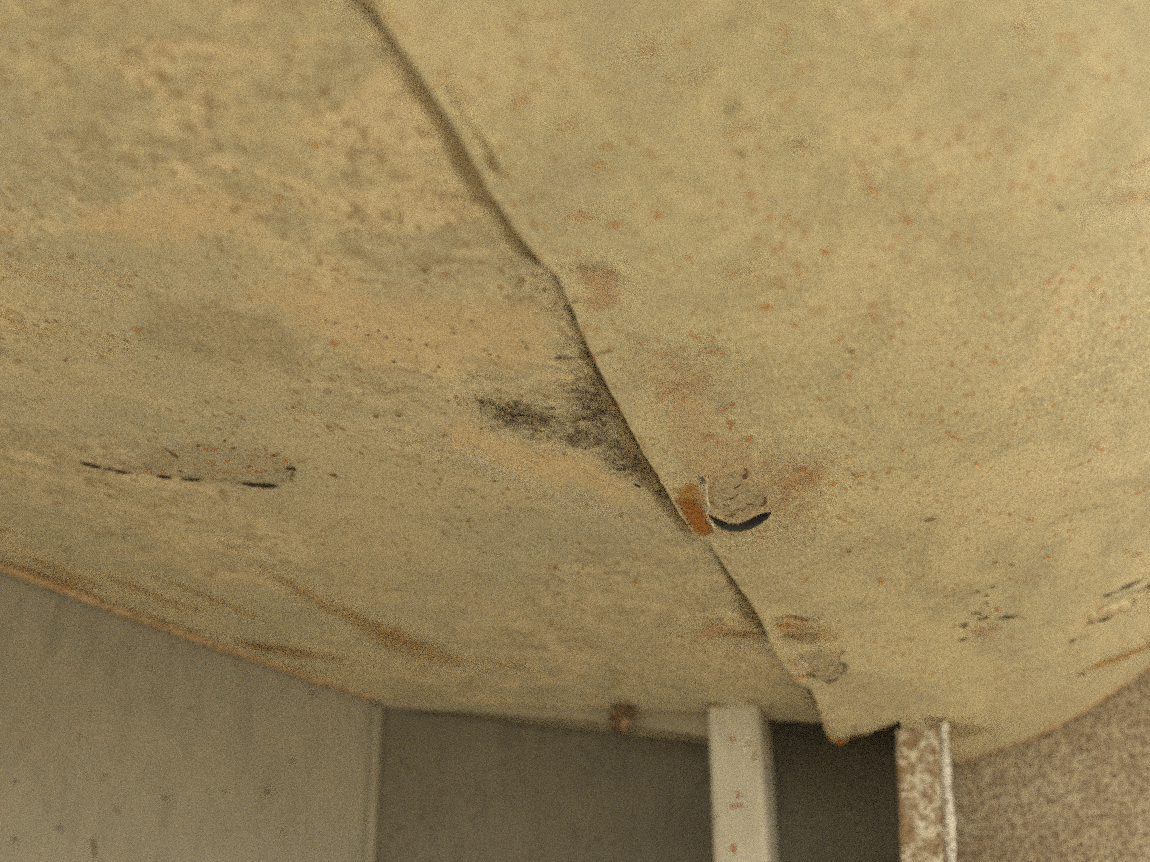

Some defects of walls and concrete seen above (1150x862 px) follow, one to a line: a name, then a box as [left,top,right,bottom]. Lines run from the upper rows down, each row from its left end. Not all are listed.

water stain [51,170,300,261]
water stain [97,255,668,515]
peeling [80,438,295,488]
corrosion [676,487,711,536]
peeling [698,468,770,535]
peeling [799,647,846,683]